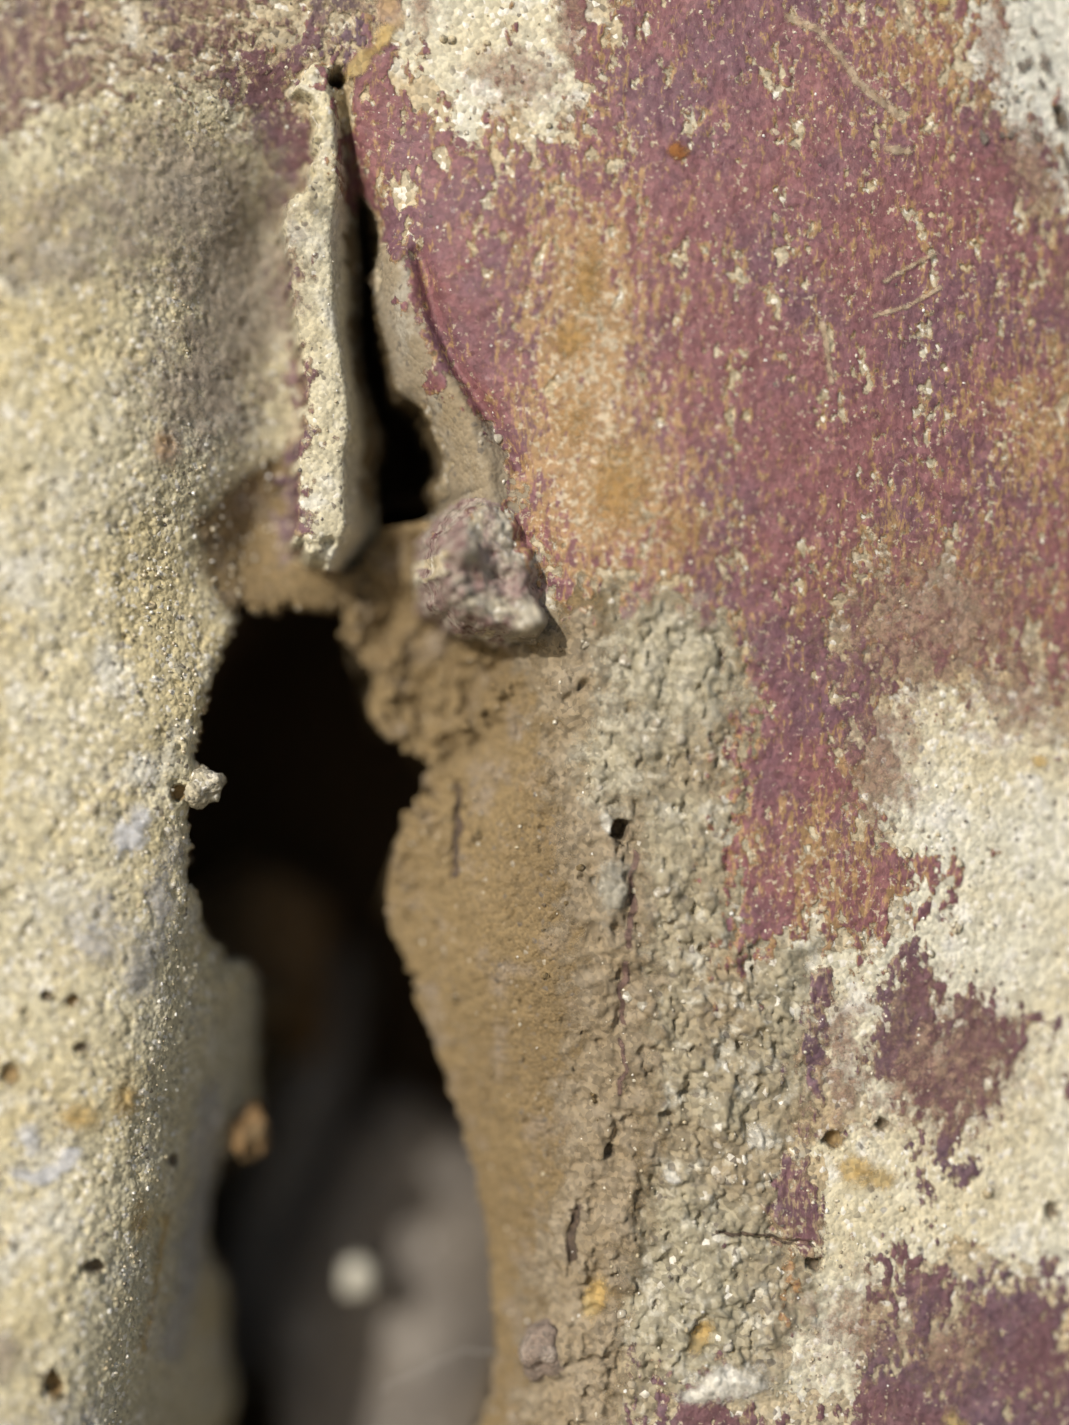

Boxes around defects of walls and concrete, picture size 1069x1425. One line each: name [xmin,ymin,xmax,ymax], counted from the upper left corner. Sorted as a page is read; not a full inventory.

peeling [260,237,305,332]
crack [354,191,445,533]
spalling [193,337,592,1425]
crack [451,783,464,878]
peeling [330,0,1069,1425]